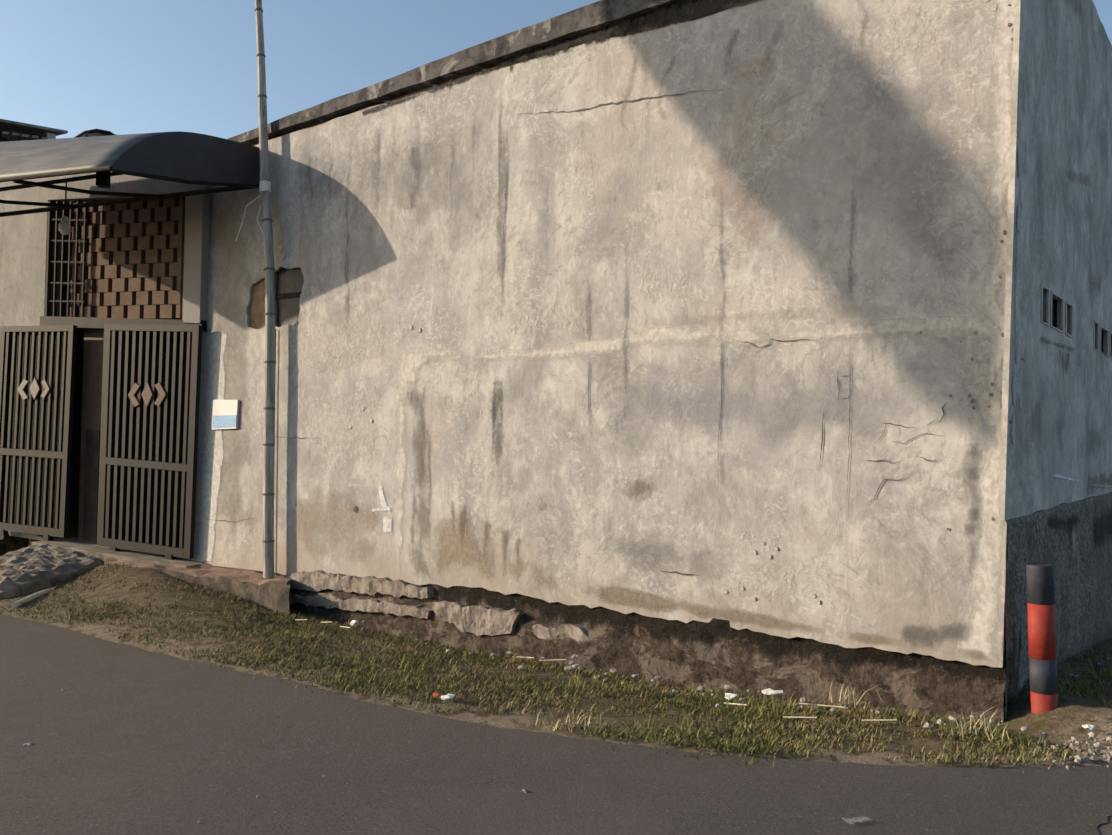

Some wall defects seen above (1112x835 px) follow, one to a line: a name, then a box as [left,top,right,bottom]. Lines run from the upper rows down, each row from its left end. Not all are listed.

crack [502,88,725,285]
flaking render [249,272,278,329]
water stain [396,389,553,586]
crack [718,339,946,527]